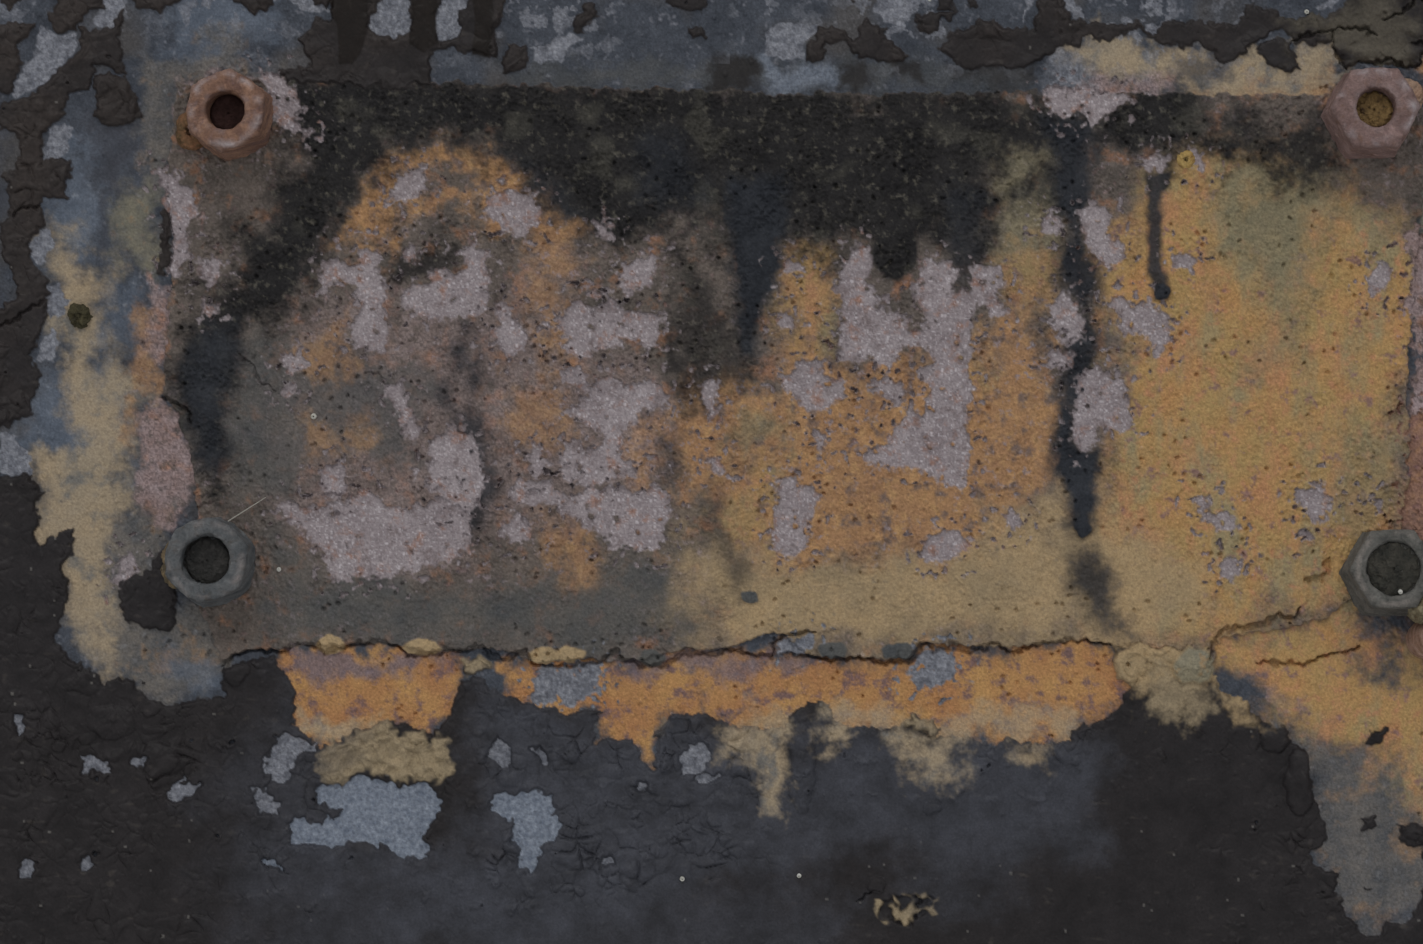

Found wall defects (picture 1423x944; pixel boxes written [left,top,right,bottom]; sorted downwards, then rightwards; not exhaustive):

peeling [368,0,413,46]
rust [510,53,713,93]
peeling [765,0,979,64]
peeling [0,0,182,477]
rust [329,142,521,260]
rust [1,23,464,750]
rust [560,0,1423,819]
rust [496,656,535,701]
crack [221,630,1113,671]
crack [1207,552,1361,671]
peeling [251,731,448,861]
peeling [491,789,563,874]